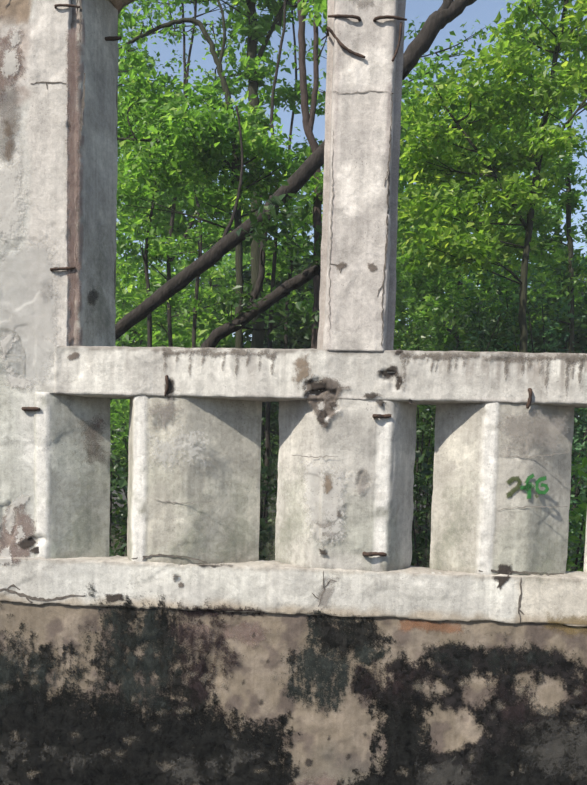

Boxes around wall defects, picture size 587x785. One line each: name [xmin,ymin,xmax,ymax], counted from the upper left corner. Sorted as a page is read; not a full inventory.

leakage [162,347,277,375]
spalling [293,355,350,427]
spalling [0,496,39,566]
crack [0,584,85,605]
crack [479,569,564,624]
leakage [0,582,312,785]
leakage [281,578,587,785]